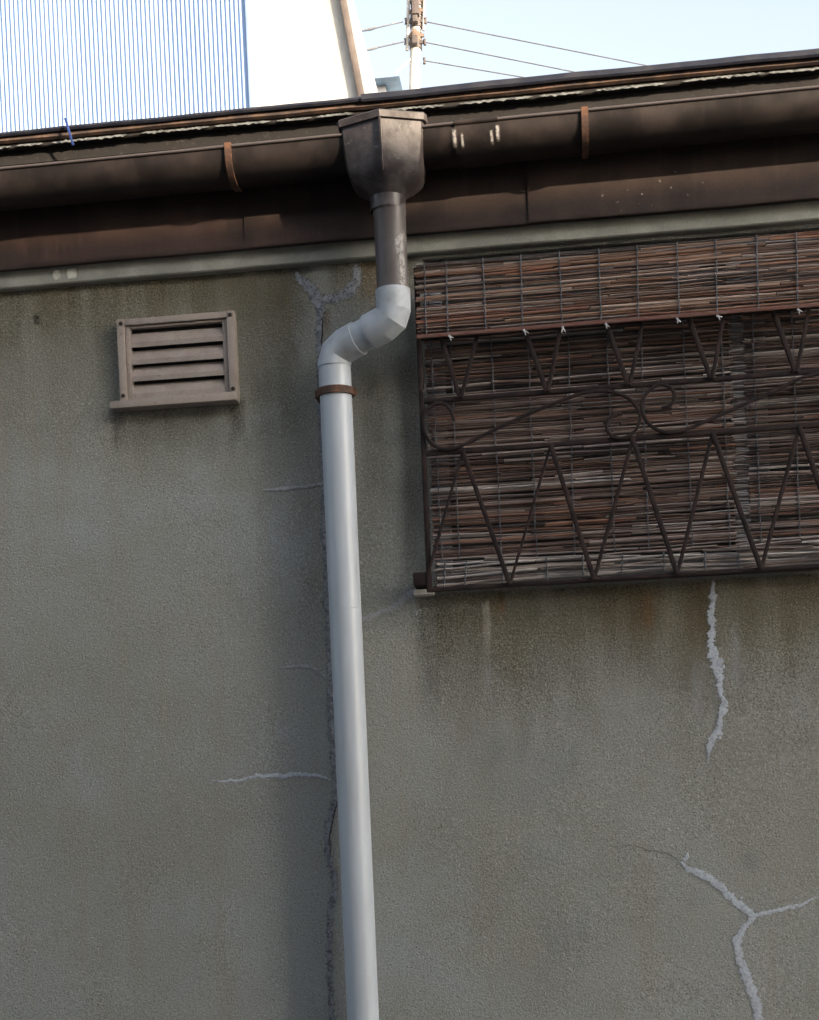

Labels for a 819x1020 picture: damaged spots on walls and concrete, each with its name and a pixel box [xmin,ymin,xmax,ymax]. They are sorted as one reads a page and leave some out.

crack [211,263,363,1020]
crack [706,580,729,764]
crack [607,843,819,1020]